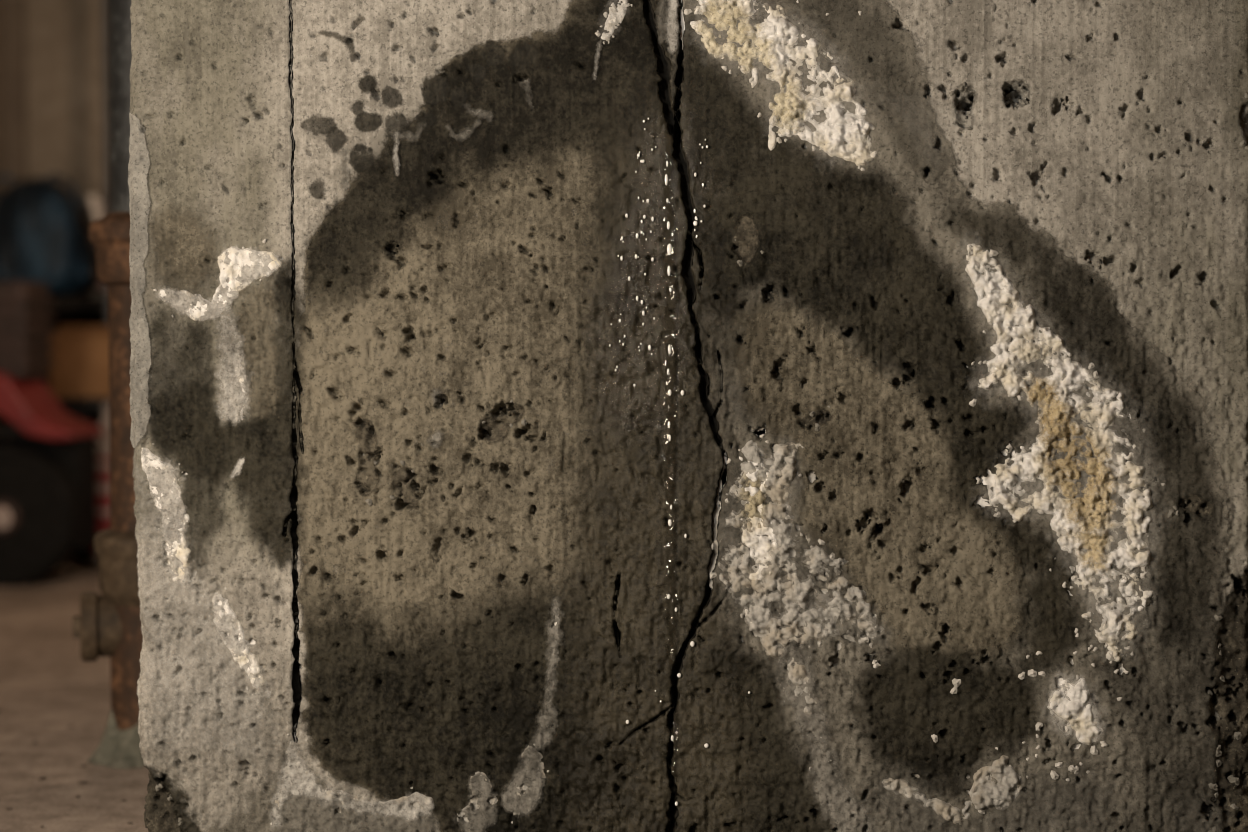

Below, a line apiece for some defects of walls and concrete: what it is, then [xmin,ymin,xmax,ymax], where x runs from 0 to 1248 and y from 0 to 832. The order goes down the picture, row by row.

water stain [301,116,347,190]
water stain [320,31,358,62]
water stain [351,101,382,132]
water stain [359,75,402,108]
water stain [151,211,283,321]
water stain [141,316,221,584]
water stain [218,316,247,422]
crack [621,0,728,832]
water stain [202,587,271,708]
crack [613,575,621,658]
water stain [711,578,838,832]
water stain [149,768,201,832]